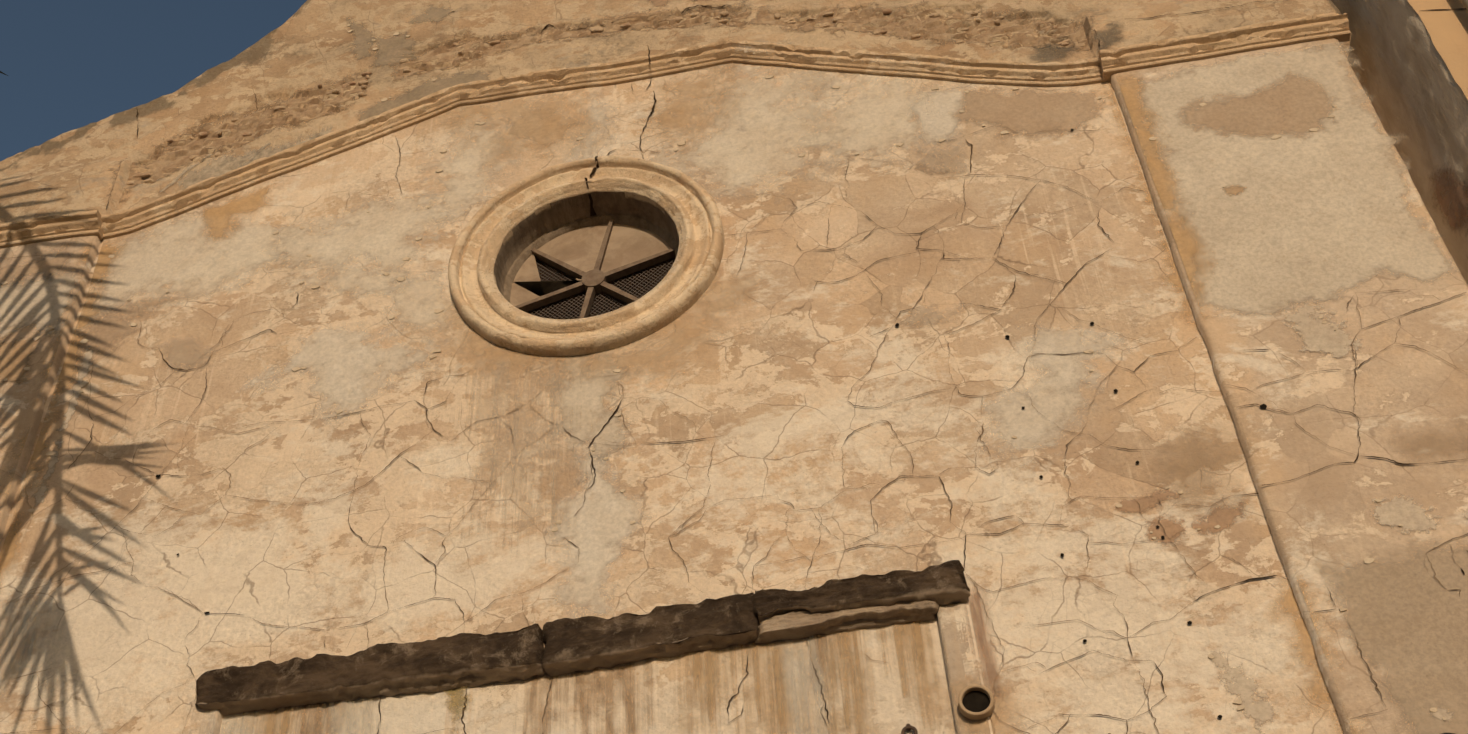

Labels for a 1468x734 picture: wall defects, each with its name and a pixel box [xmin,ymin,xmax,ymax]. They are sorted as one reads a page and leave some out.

spalling [107,0,1102,203]
crack [484,5,725,216]
flaking render [0,250,75,384]
flaking render [28,122,510,513]
crack [1,295,727,734]
crack [732,124,1468,734]
crack [727,644,749,722]
flaking render [1322,548,1468,734]